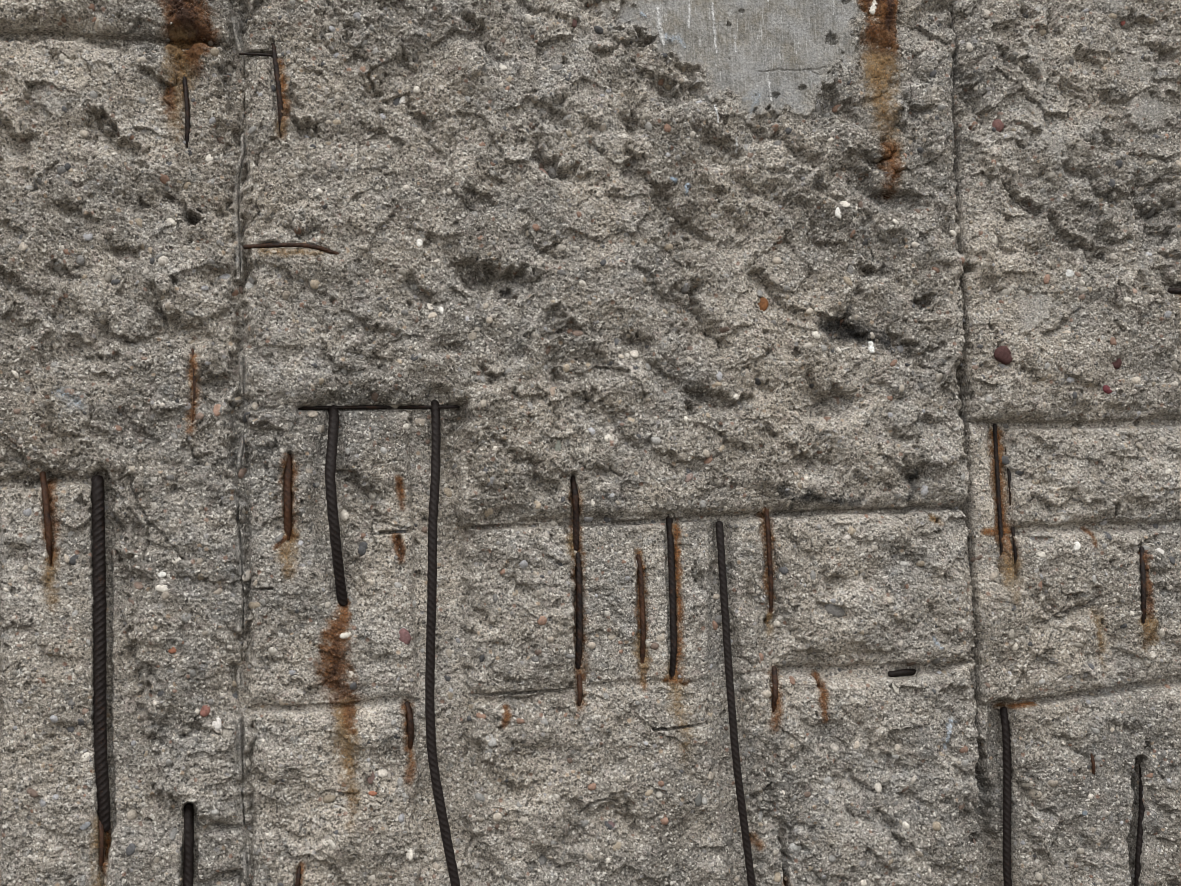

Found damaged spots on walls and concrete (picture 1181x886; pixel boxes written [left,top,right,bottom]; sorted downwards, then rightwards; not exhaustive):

corrosion [160,0,217,139]
corrosion [858,0,902,199]
corrosion [42,479,59,604]
spalling [91,475,111,867]
corrosion [316,599,360,823]
spalling [298,399,460,886]
spalling [570,475,583,706]
spalling [666,516,677,680]
corrosion [663,523,689,747]
spalling [715,521,756,886]
corrosion [981,427,1018,586]
spalling [997,707,1052,886]